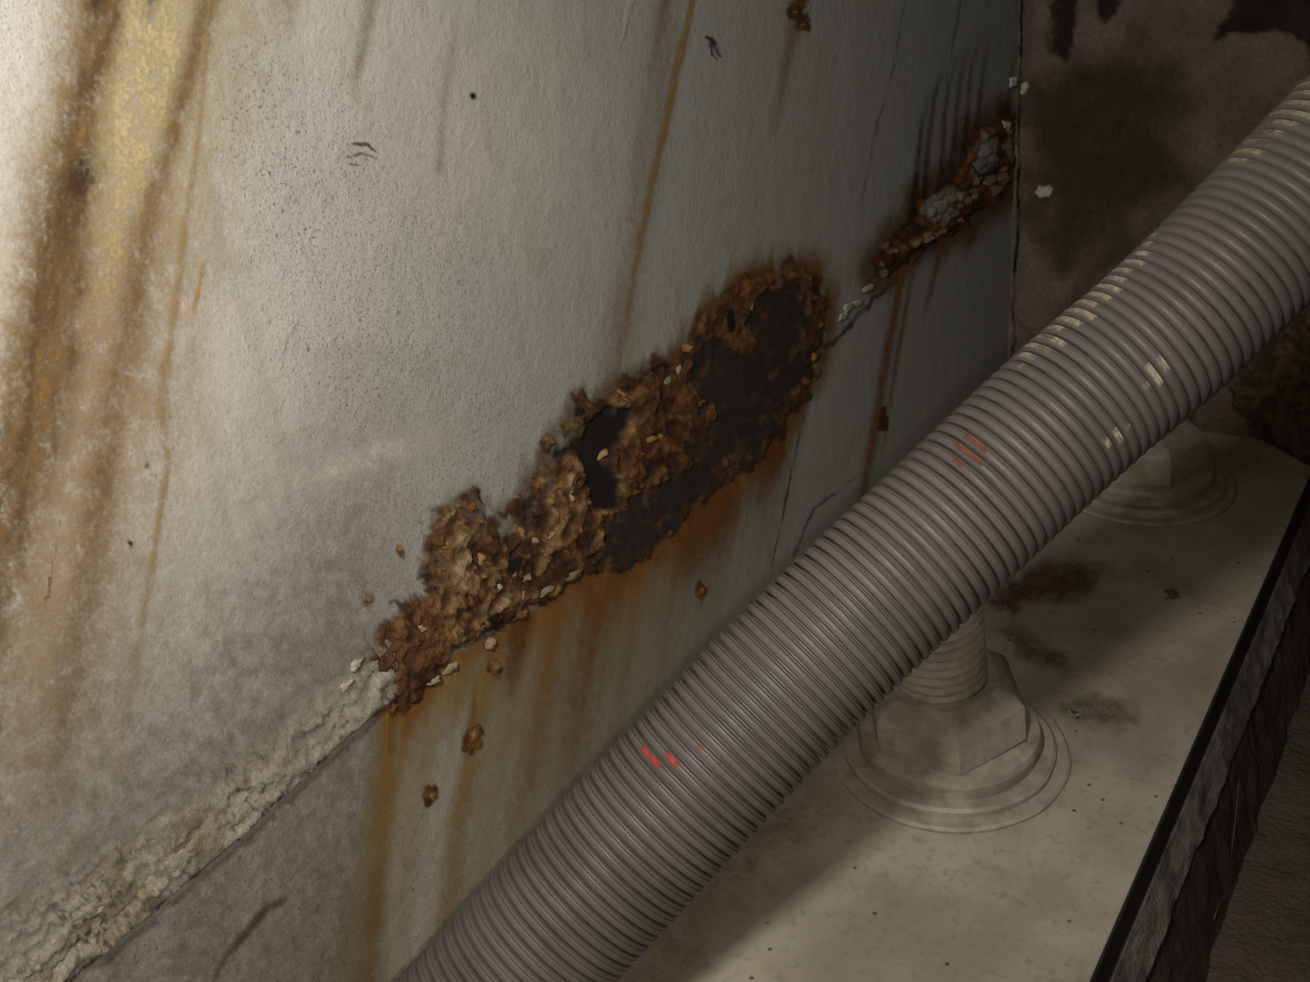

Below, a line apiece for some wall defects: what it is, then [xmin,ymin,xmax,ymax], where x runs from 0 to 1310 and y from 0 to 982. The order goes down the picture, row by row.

corrosion [787,0,811,44]
leakage [1216,0,1310,49]
corrosion [633,0,695,273]
leakage [1032,0,1177,264]
corrosion [861,76,1019,496]
crack [144,867,202,905]
crack [64,957,98,982]